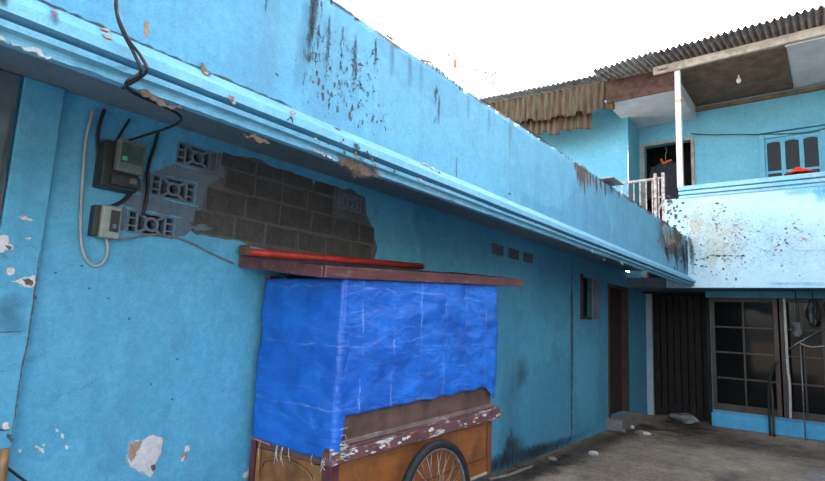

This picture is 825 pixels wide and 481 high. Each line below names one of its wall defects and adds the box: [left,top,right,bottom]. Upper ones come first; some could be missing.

spalling [0,35,53,60]
spalling [139,89,186,110]
crack [0,88,15,214]
spalling [243,133,270,144]
rust [574,162,620,197]
peeling [0,233,14,253]
peeling [4,267,38,288]
crack [0,254,40,443]
peeling [125,433,167,478]
water stain [478,425,653,481]